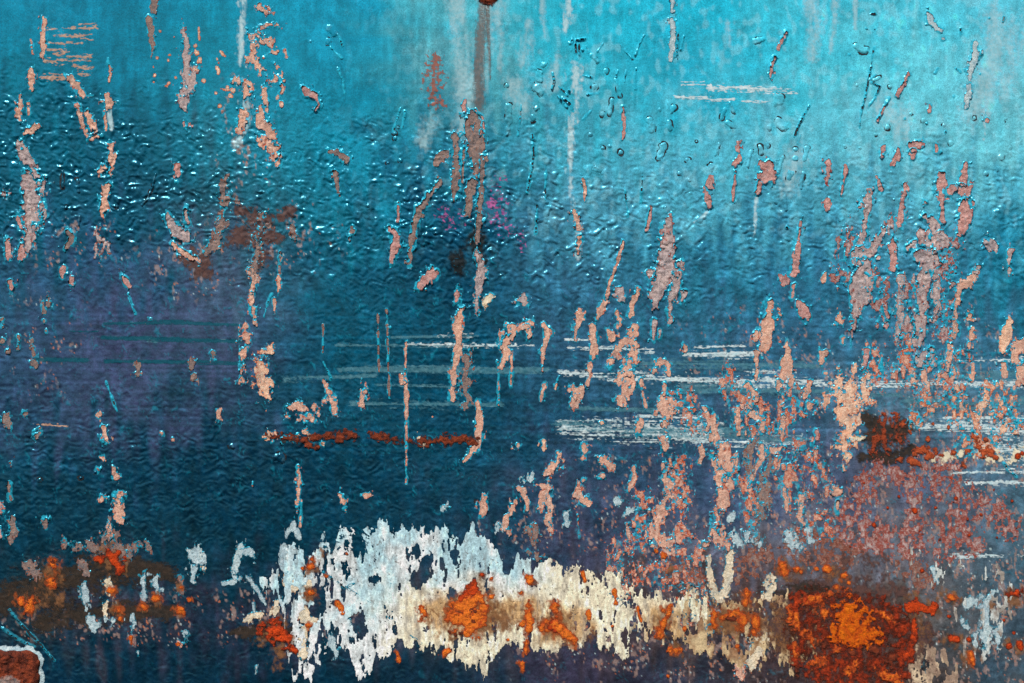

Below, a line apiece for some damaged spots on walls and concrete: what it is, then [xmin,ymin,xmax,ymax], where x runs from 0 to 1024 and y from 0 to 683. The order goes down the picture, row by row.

peeling [145,0,289,170]
peeling [0,15,51,264]
peeling [58,226,78,291]
peeling [63,56,121,262]
peeling [171,159,183,185]
peeling [159,173,242,267]
peeling [0,291,54,370]
peeling [221,96,1024,683]
rust [856,409,1024,468]
rust [0,542,193,645]
rust [417,572,594,673]
rust [707,546,975,683]